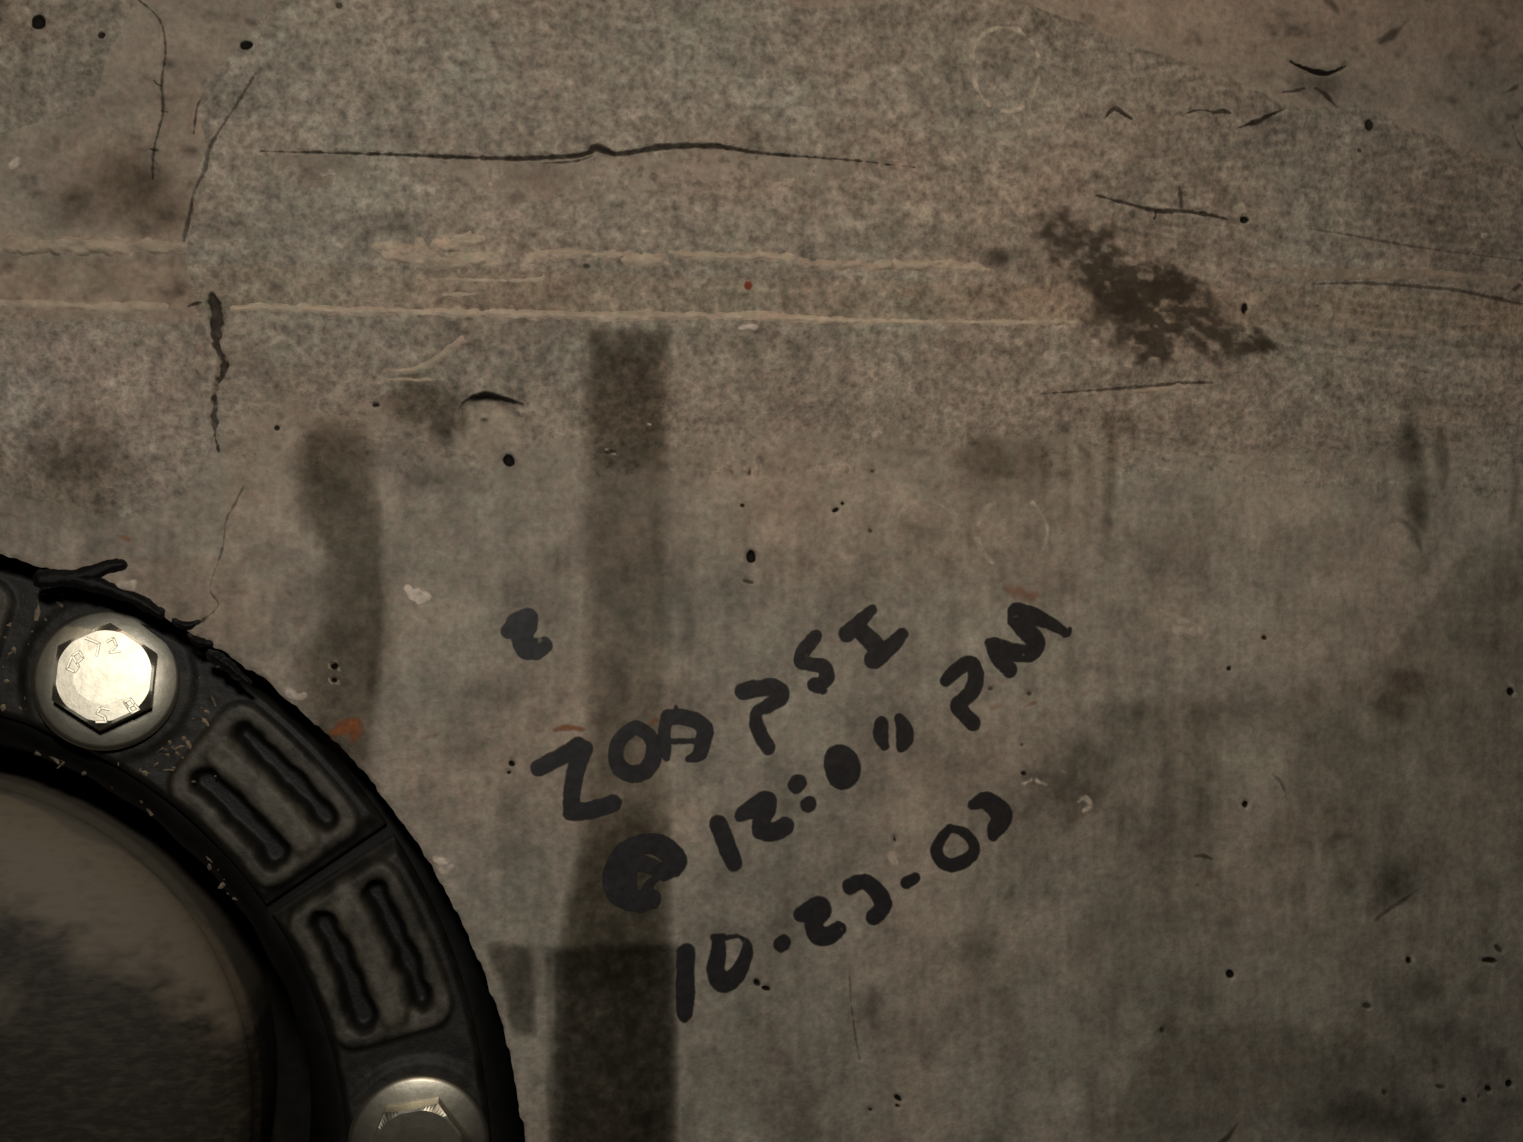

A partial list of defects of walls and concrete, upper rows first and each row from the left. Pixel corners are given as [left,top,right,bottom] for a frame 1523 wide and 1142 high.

crack [139,0,251,155]
crack [303,143,915,168]
crack [1096,187,1227,220]
crack [191,292,229,452]